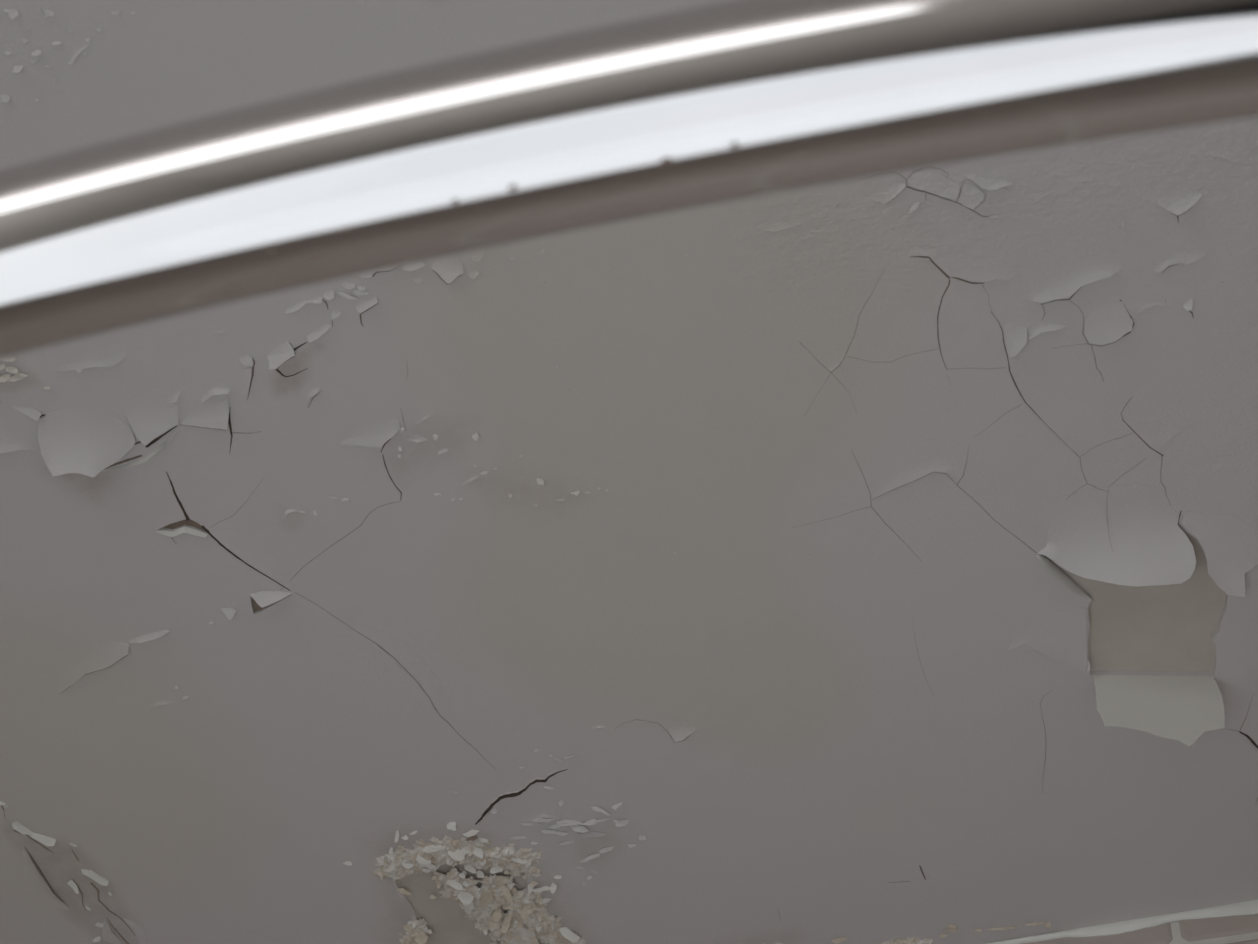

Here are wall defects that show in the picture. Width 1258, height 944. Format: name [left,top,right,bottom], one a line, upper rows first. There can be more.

peeling [875,165,1013,218]
peeling [0,357,28,384]
peeling [0,392,180,478]
peeling [267,249,493,408]
peeling [1004,253,1194,381]
crack [156,410,698,825]
peeling [1009,483,1258,747]
crack [1228,694,1258,802]
peeling [0,802,146,944]
spalling [372,800,646,944]